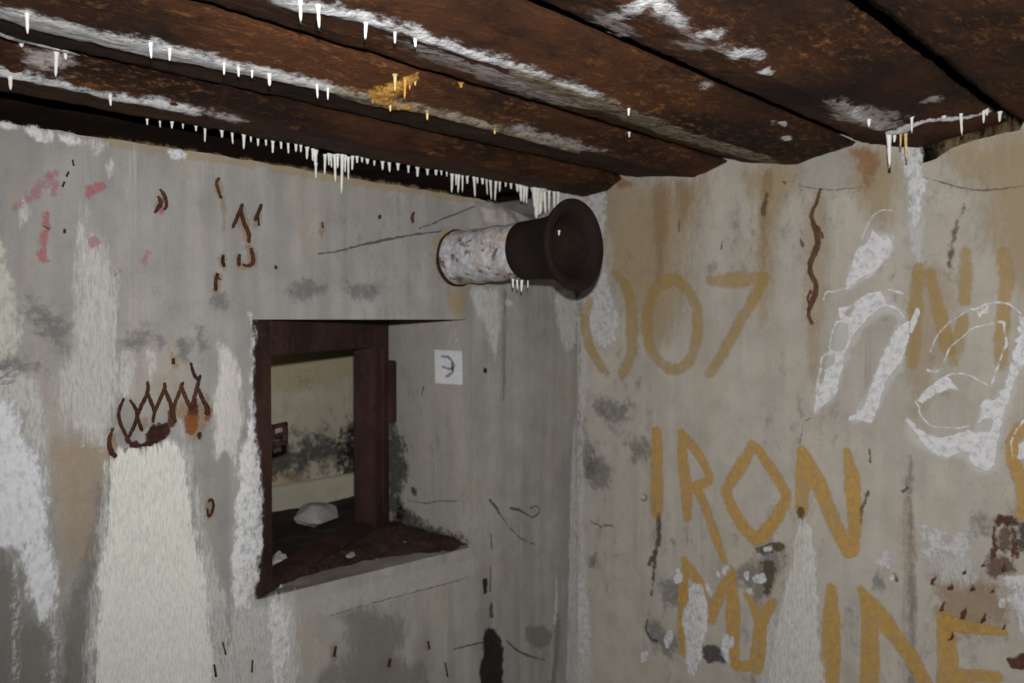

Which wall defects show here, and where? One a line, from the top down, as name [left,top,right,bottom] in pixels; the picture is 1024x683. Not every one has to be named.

water stain [0,8,607,237]
efflorescence [830,101,1003,264]
water stain [0,203,354,683]
mould [389,423,467,542]
water stain [553,258,620,683]
water stain [479,567,504,683]